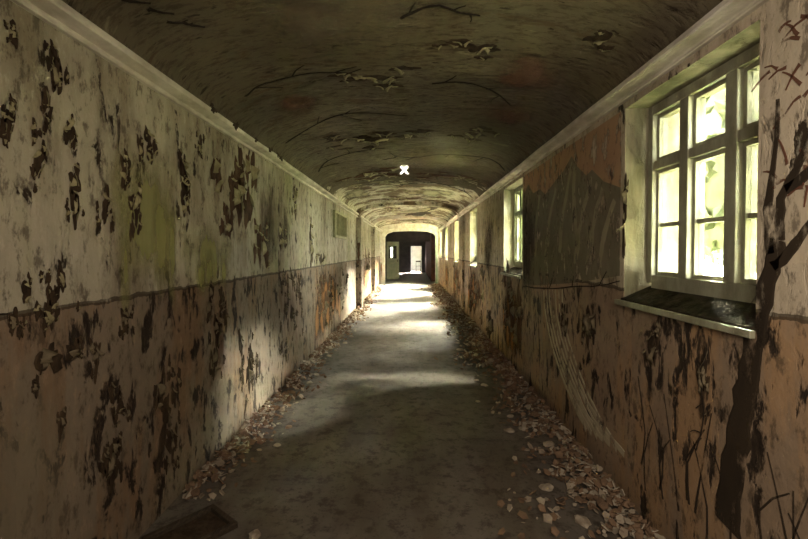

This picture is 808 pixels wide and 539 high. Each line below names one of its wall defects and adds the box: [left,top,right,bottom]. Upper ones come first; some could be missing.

peeling [0,93,18,149]
peeling [30,39,70,193]
peeling [63,113,78,150]
peeling [65,162,85,230]
peeling [95,184,115,233]
peeling [120,125,159,242]
peeling [177,148,191,220]
spalling [210,146,270,270]
spalling [374,190,450,223]
peeling [206,281,230,381]
peeling [238,328,260,419]
peeling [279,267,304,361]